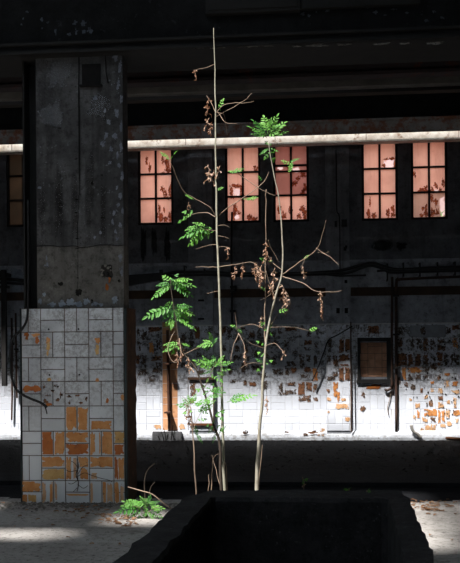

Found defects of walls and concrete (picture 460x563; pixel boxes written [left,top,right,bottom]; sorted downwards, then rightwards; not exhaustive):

peeling [326,339,350,413]
peeling [398,325,460,431]
peeling [22,385,124,503]